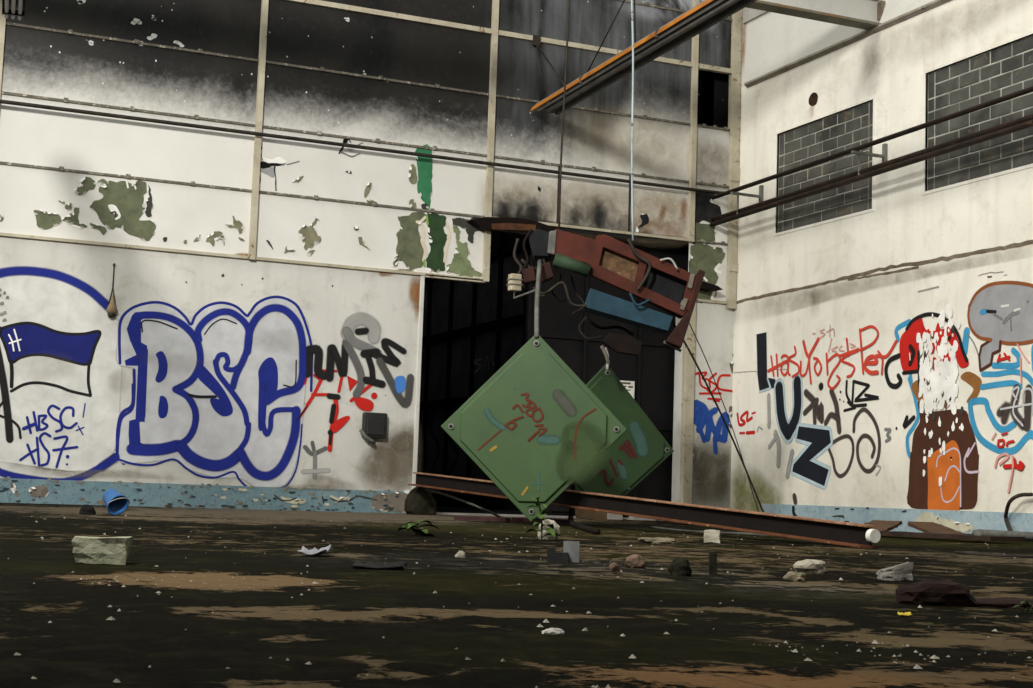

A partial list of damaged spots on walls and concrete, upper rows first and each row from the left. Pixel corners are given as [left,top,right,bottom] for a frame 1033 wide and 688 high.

peeling [34,176,167,242]
peeling [184,216,245,247]
peeling [266,215,322,257]
peeling [393,144,482,277]
leakage [495,205,542,221]
leakage [591,207,604,229]